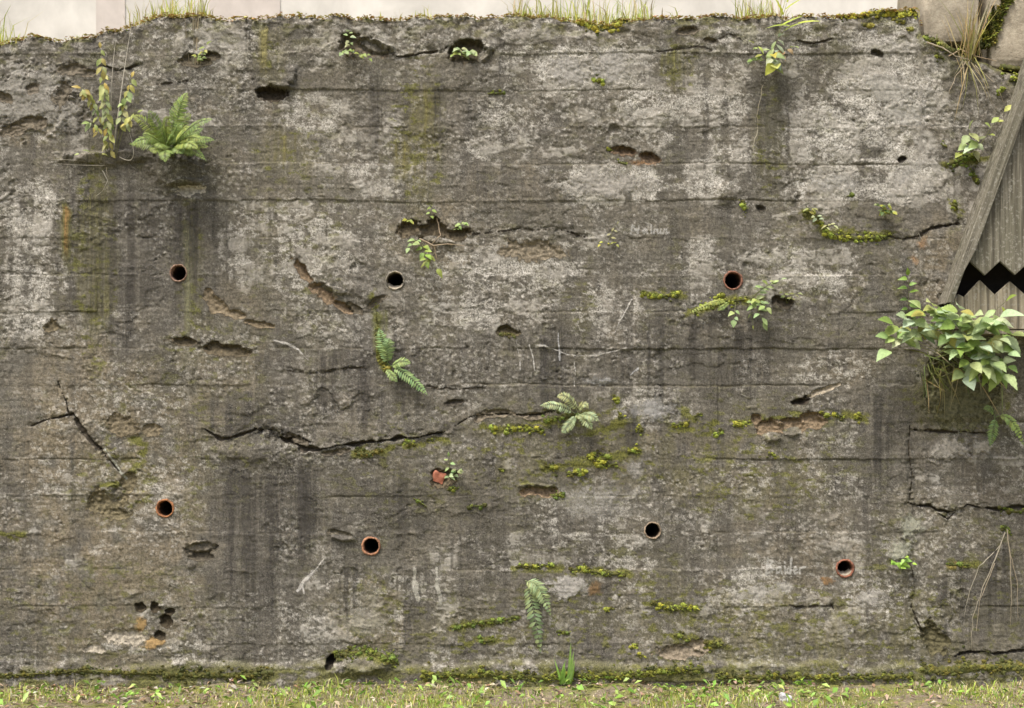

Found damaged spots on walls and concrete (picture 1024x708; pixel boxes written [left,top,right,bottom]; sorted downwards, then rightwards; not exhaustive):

spalling [609,145,662,164]
spalling [202,288,275,329]
spalling [291,257,390,315]
crack [31,381,119,470]
crack [205,410,557,452]
spalling [751,383,841,443]
crack [907,425,1024,520]
crack [907,557,923,634]
spalling [79,601,175,654]